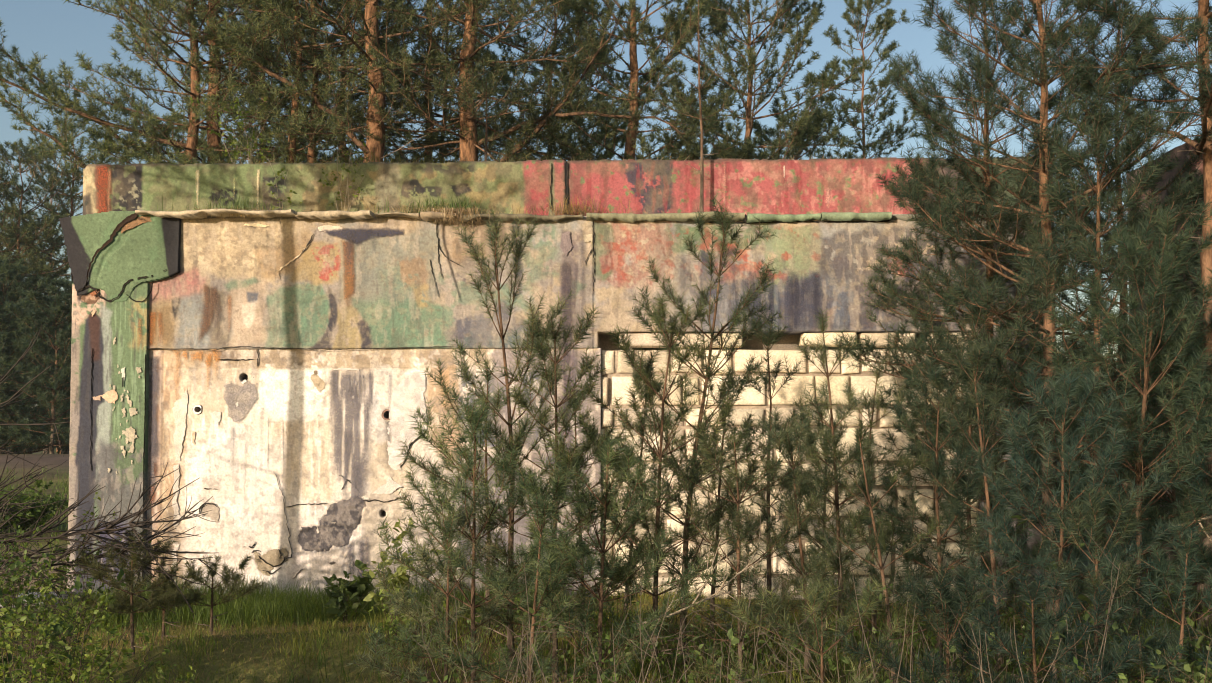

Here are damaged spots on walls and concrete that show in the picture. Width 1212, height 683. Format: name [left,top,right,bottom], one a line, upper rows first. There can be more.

crack [278,234,314,279]
crack [550,161,595,295]
crack [87,349,95,471]
peeling [93,365,142,464]
spalling [199,503,219,522]
spalling [210,377,257,427]
crack [142,346,451,582]
peeling [254,368,427,576]
water stain [332,372,372,499]